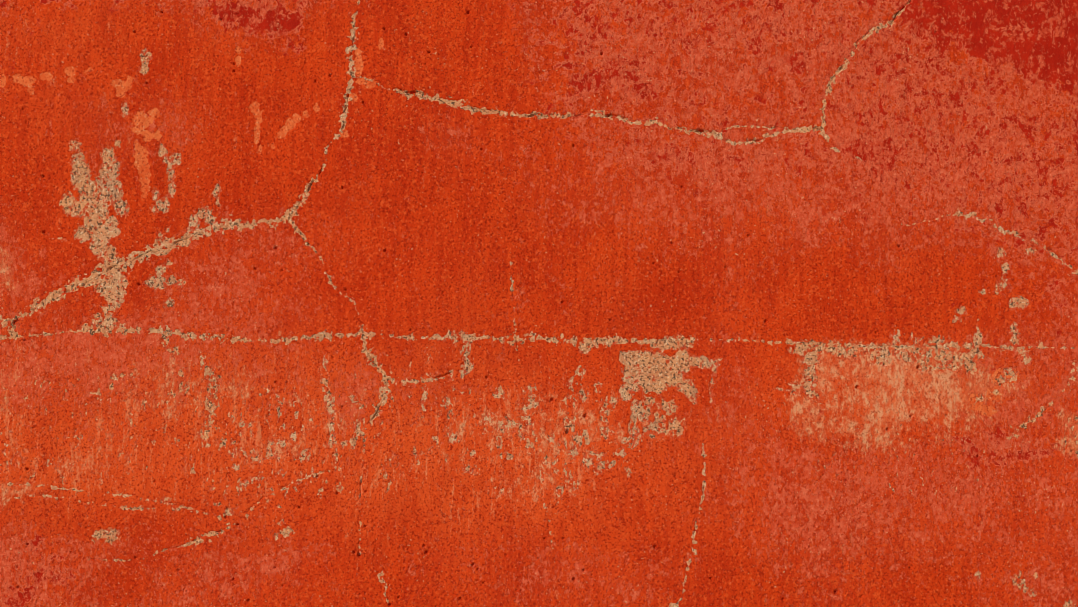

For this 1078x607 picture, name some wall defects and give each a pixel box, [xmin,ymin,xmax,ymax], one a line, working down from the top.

peeling [57,47,188,332]
peeling [183,183,222,233]
crack [0,0,1078,455]
crack [356,469,364,555]
peeling [0,329,723,545]
crack [668,443,707,607]
peeling [755,247,1046,493]